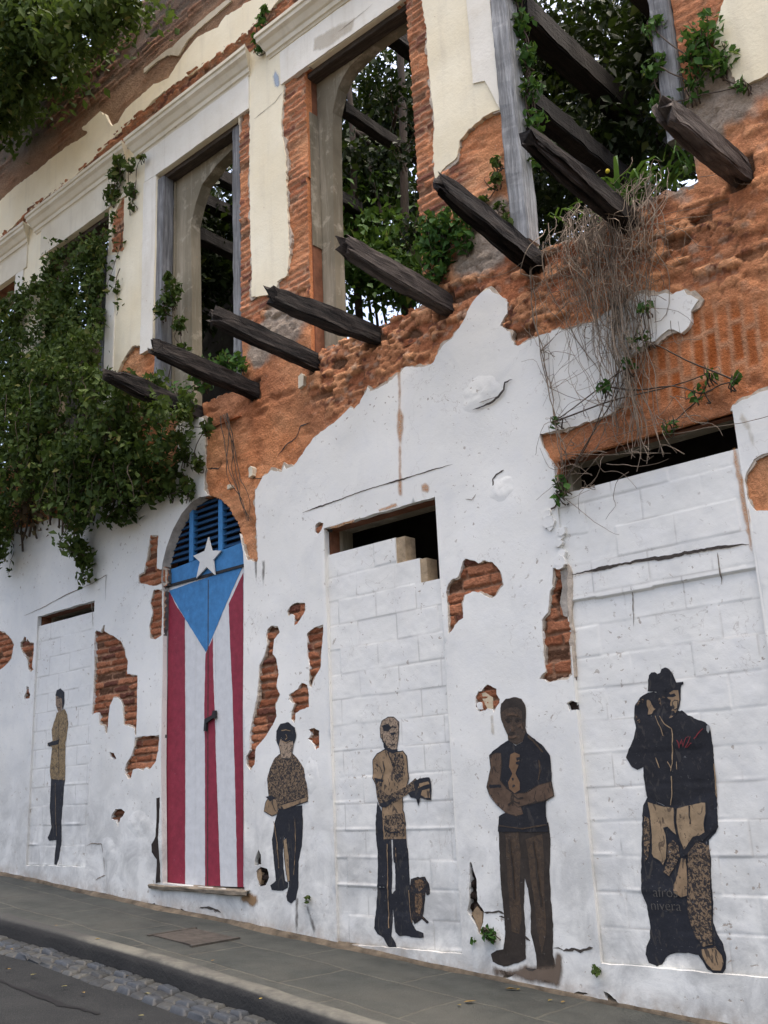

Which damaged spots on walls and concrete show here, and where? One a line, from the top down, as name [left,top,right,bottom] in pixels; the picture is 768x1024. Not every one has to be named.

flaking render [0,0,298,201]
flaking render [202,0,768,562]
flaking render [121,346,155,379]
crack [305,464,452,512]
flaking render [140,535,173,639]
flaking render [448,559,503,632]
flaking render [542,510,577,682]
crack [572,544,749,585]
flaking render [0,631,34,670]
flaking render [94,631,167,777]
flaking render [248,627,323,767]
flaking render [476,685,500,711]